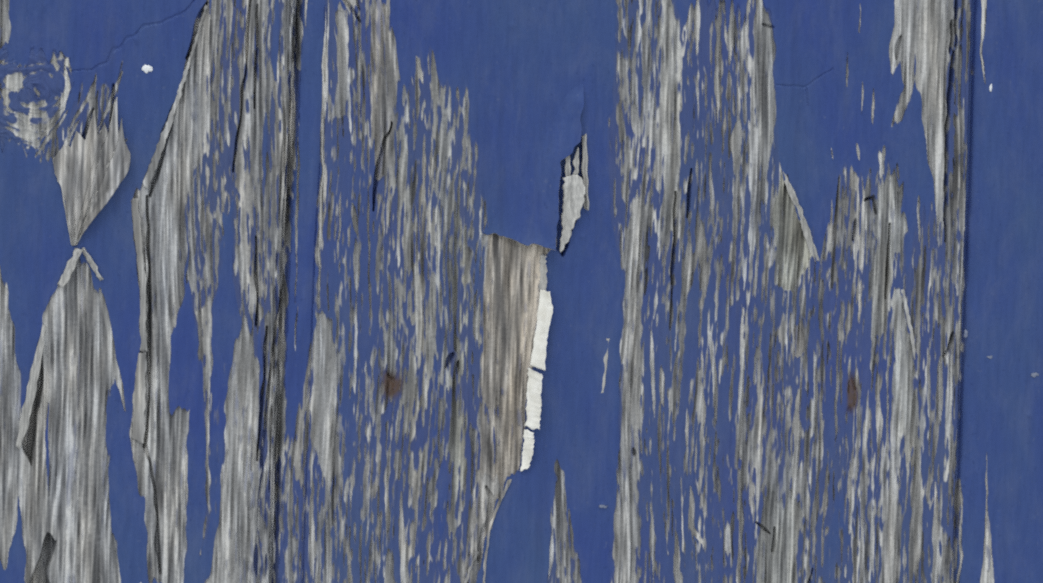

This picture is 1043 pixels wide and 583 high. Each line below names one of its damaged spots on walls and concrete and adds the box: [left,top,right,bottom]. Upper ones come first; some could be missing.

crack [69,0,201,76]
peeling [0,0,589,583]
peeling [599,0,992,583]
peeling [980,461,995,583]